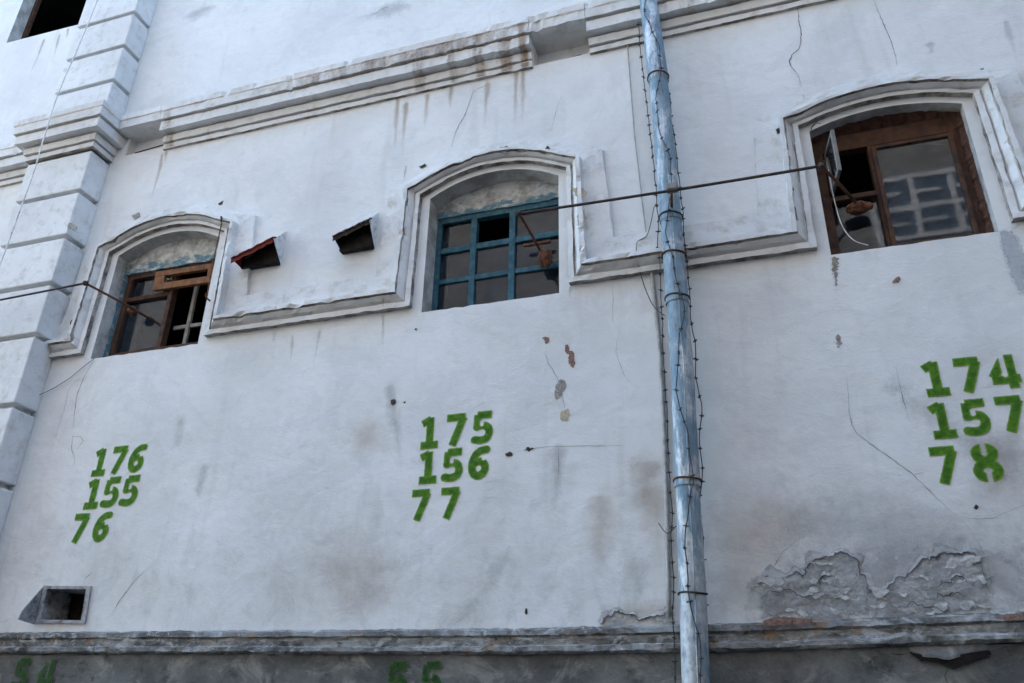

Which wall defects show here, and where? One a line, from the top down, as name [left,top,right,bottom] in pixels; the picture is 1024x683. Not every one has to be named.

flaking render [565,345,575,368]
flaking render [554,379,566,399]
crack [848,393,1023,579]
flaking render [746,542,1024,626]
flaking render [598,606,674,627]